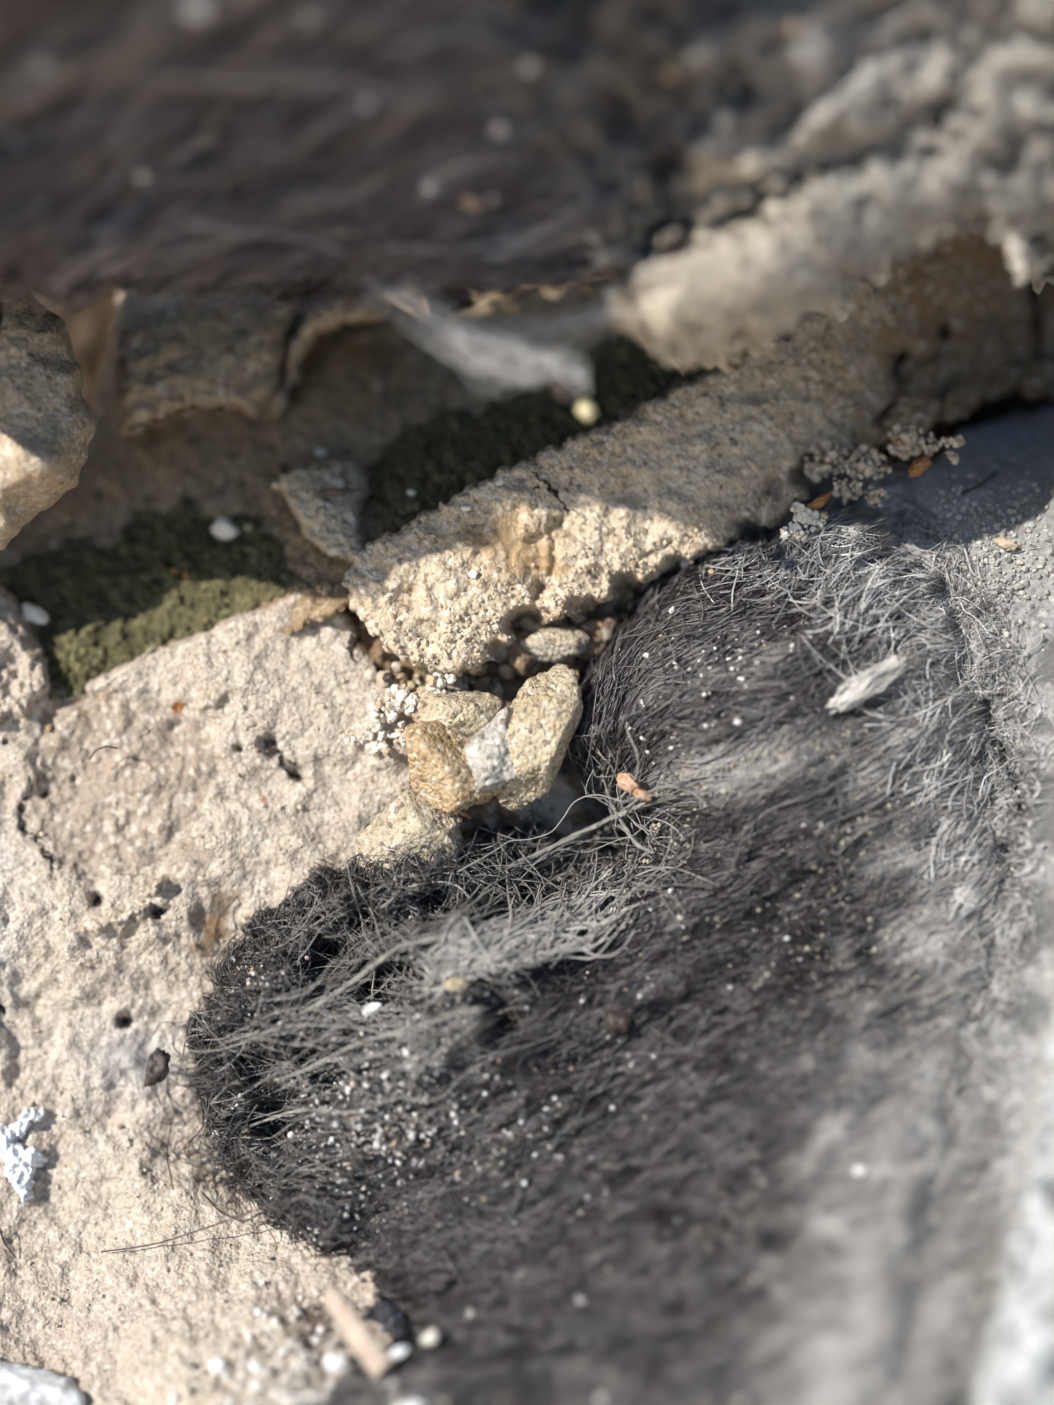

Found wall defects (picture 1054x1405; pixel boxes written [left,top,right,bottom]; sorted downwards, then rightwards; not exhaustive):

peeling [994,537,1019,552]
peeling [616,773,652,802]